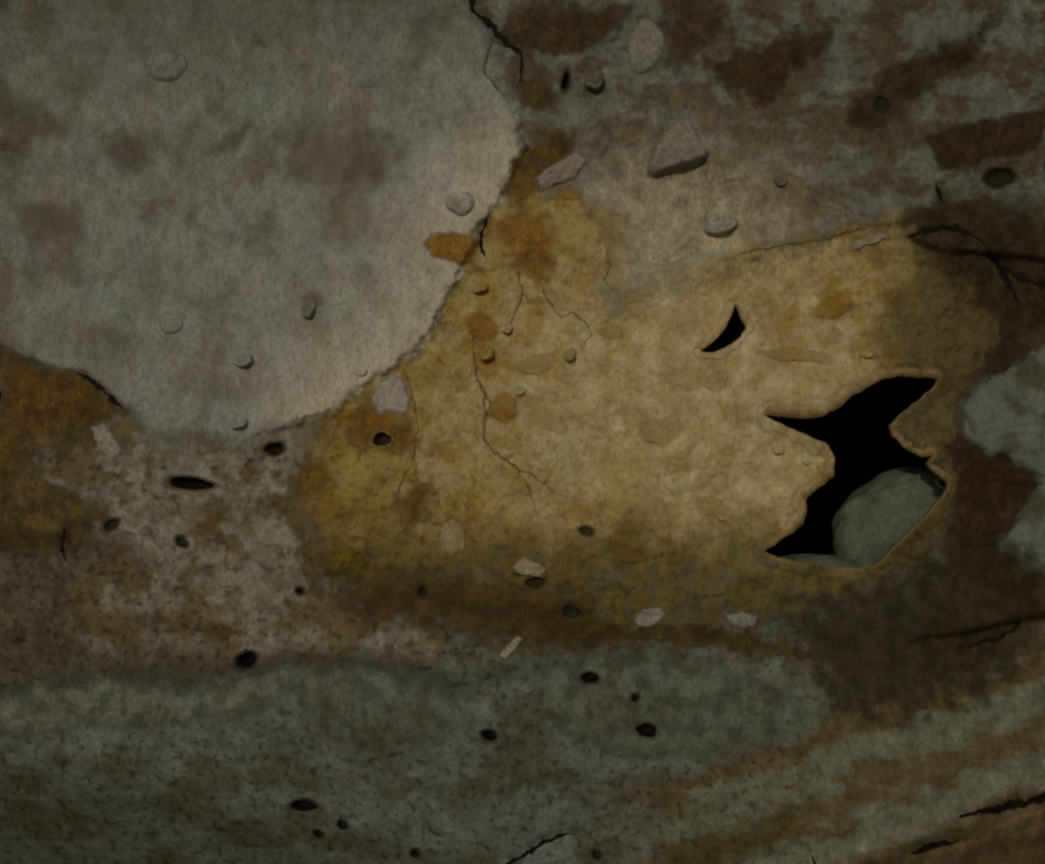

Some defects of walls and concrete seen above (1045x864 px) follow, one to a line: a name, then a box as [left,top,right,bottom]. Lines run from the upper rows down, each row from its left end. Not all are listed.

crack [468,0,523,93]
spalling [92,151,1001,658]
crack [506,833,577,864]